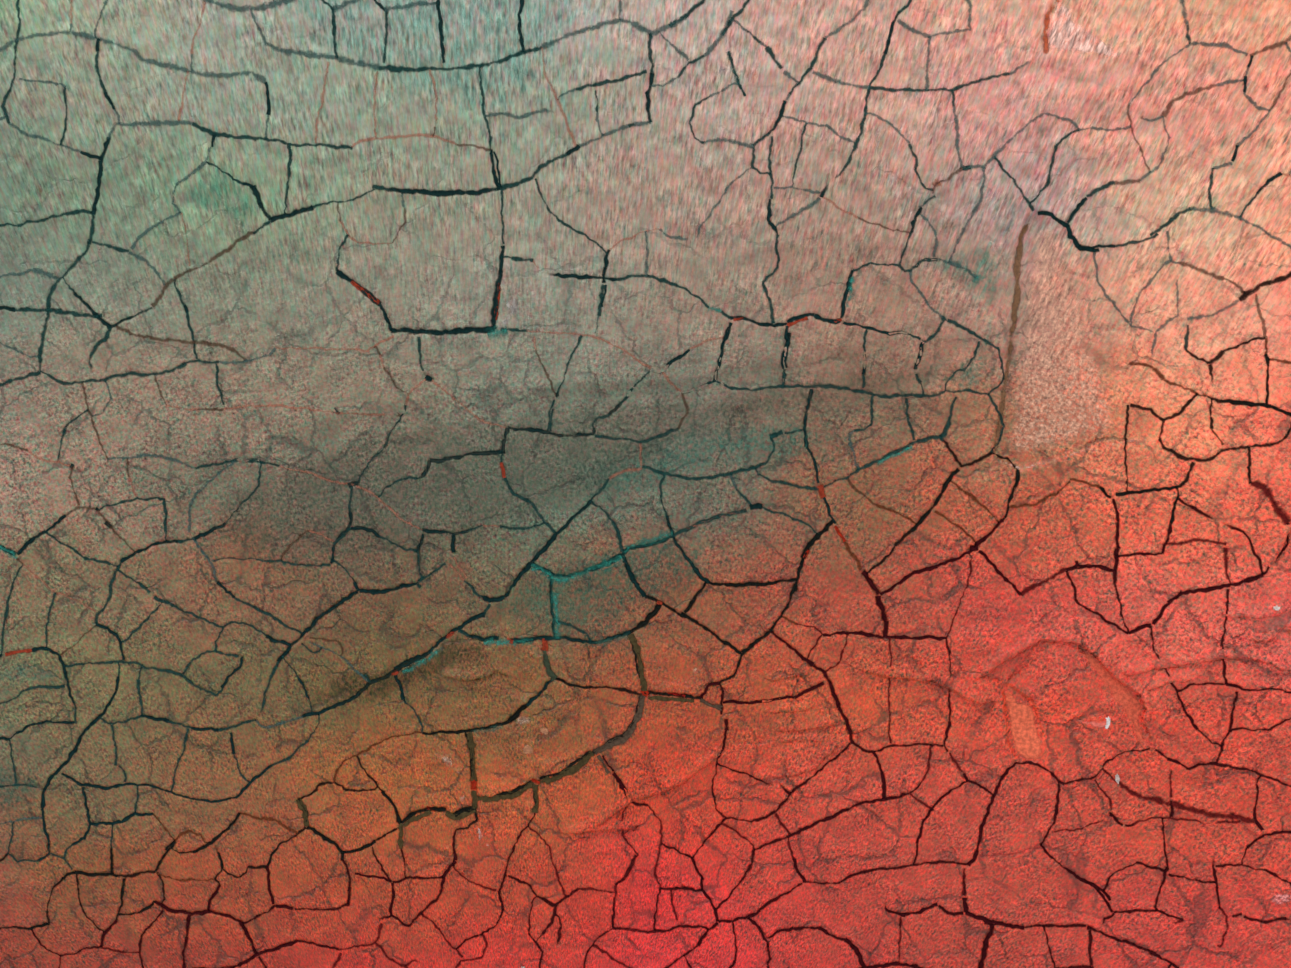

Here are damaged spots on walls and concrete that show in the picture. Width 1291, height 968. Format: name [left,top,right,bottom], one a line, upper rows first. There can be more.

crack [0,0,783,532]
crack [0,335,1291,968]
crack [547,0,1226,677]
crack [1038,0,1291,354]
crack [1129,294,1291,525]